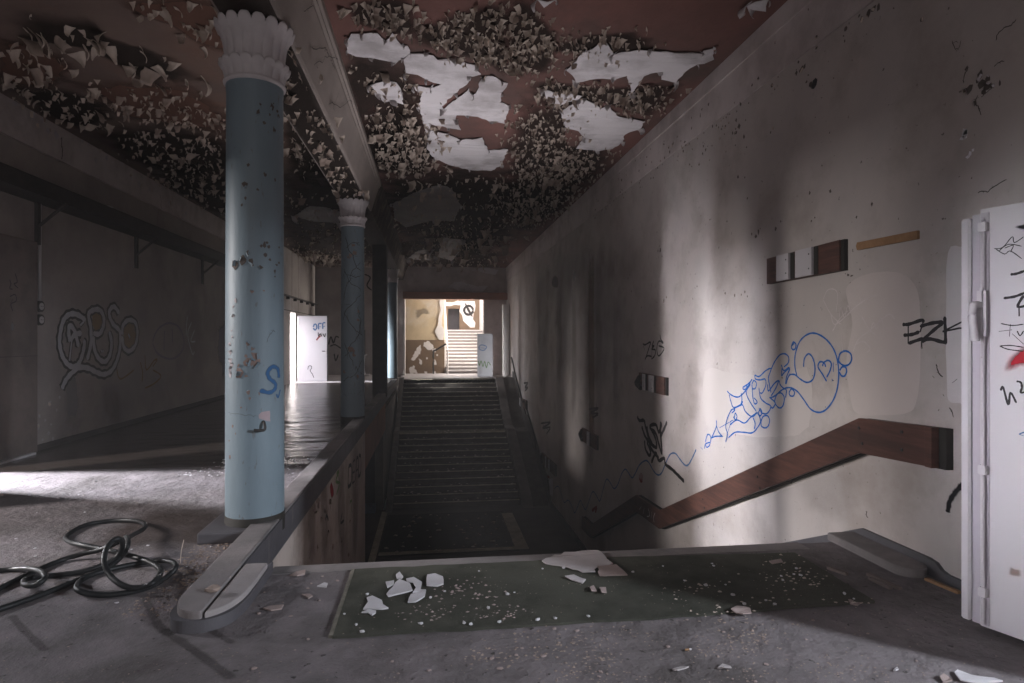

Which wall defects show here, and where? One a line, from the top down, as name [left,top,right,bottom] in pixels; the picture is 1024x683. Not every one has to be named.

peeling [128,0,223,59]
peeling [737,0,771,19]
peeling [0,14,226,218]
peeling [232,47,370,277]
peeling [337,0,717,267]
peeling [228,298,261,378]
peeling [409,300,475,374]